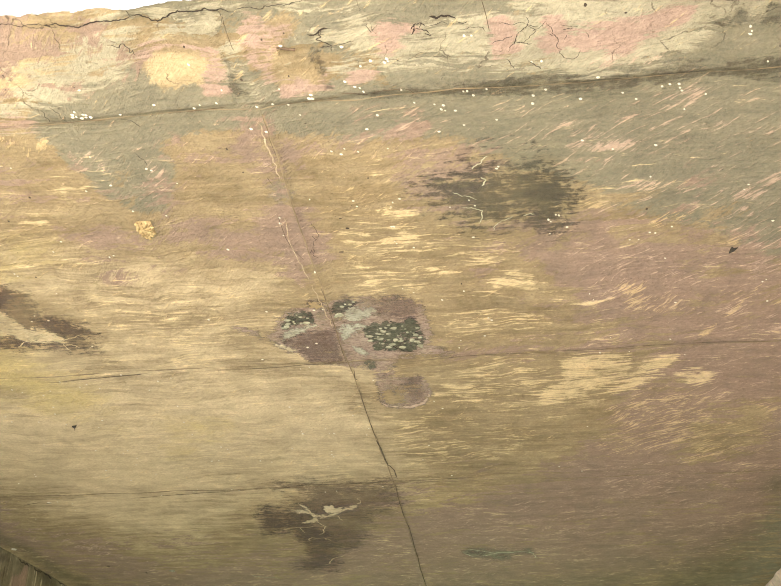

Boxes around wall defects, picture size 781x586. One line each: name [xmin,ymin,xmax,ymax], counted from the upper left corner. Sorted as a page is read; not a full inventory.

crack [0,0,306,49]
crack [307,28,353,51]
crack [411,15,589,69]
damp [0,289,102,354]
damp [254,477,402,574]